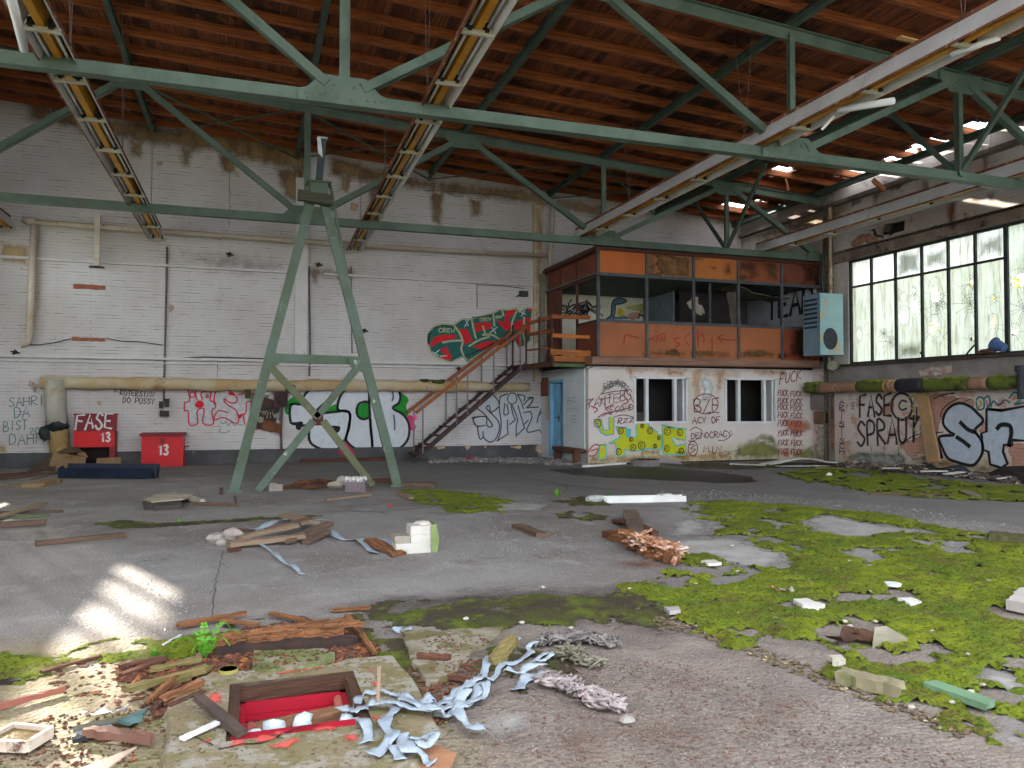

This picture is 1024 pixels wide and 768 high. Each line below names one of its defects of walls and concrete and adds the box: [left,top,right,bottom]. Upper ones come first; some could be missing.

leakage [31,105,78,126]
leakage [109,121,304,200]
leakage [332,159,385,199]
leakage [404,178,601,253]
peeling [1008,443,1024,466]
crack [210,551,228,616]